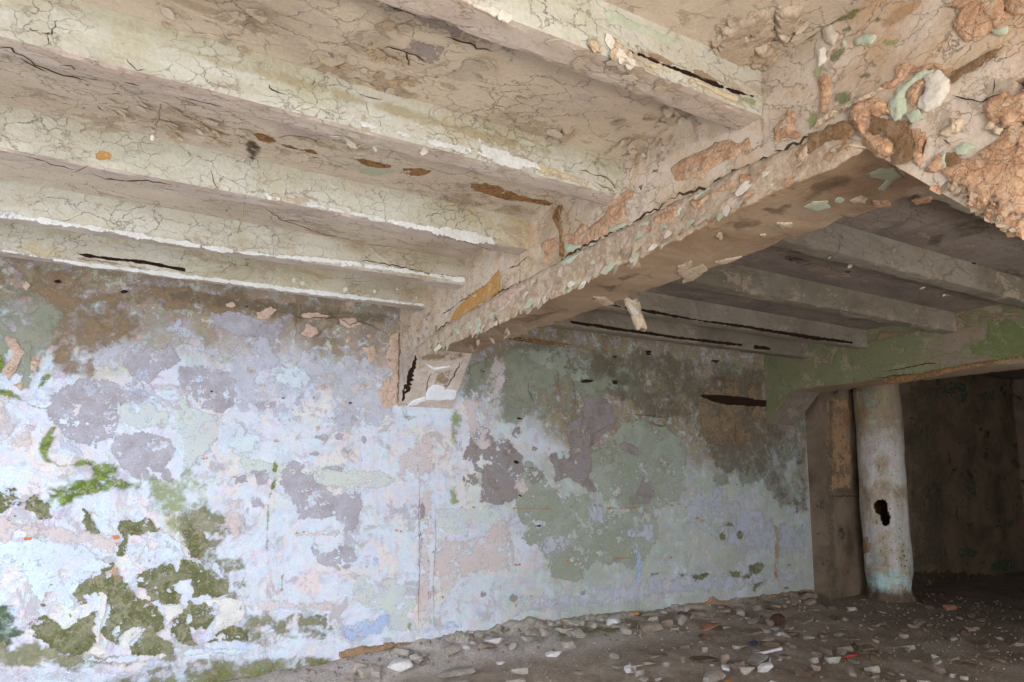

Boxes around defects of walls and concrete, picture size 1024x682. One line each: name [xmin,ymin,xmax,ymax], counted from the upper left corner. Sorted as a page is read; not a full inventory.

crack [2,21,145,112]
crack [385,46,426,66]
crack [27,156,172,185]
crack [560,136,808,261]
spalling [0,0,1024,505]
crack [295,308,460,401]
peeling [0,487,52,521]
peeling [81,508,100,535]
peeling [28,517,249,657]
flaking render [233,433,363,533]
flaking render [311,544,368,570]
leakage [466,343,807,557]